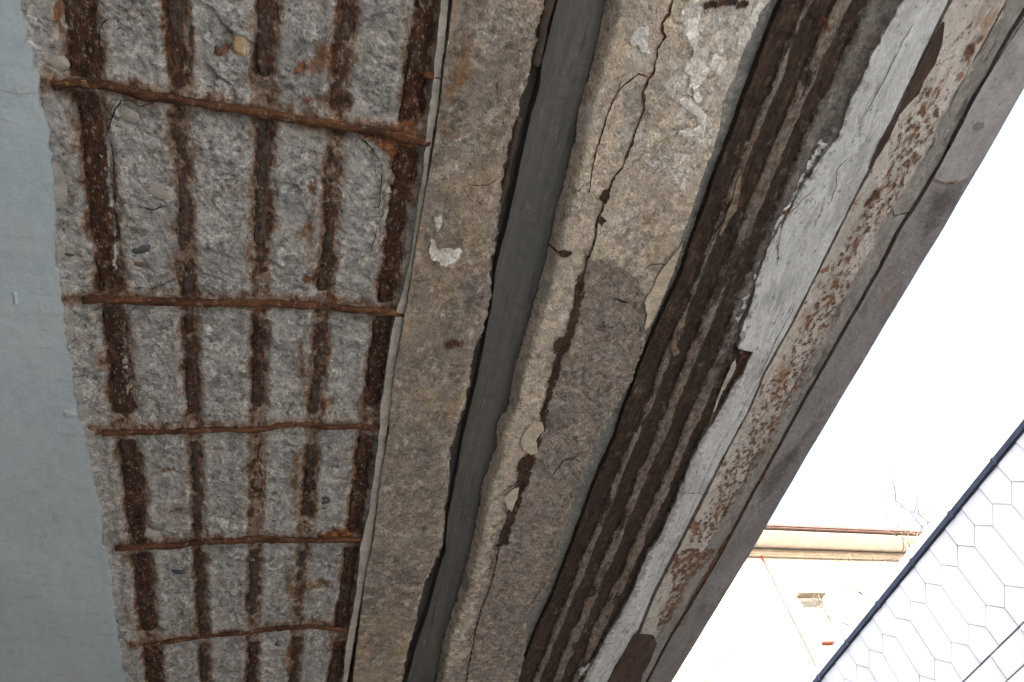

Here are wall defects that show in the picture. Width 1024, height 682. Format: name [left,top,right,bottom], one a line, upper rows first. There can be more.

rust [164,1,174,75]
spalling [21,0,448,682]
rust [294,42,337,75]
peeling [429,215,462,267]
crack [466,434,541,682]
rust [496,274,585,547]
spalling [463,243,683,682]
crack [570,0,674,329]
peeling [640,3,762,174]
peeling [713,351,751,412]
rust [657,86,949,636]
rust [964,36,984,62]